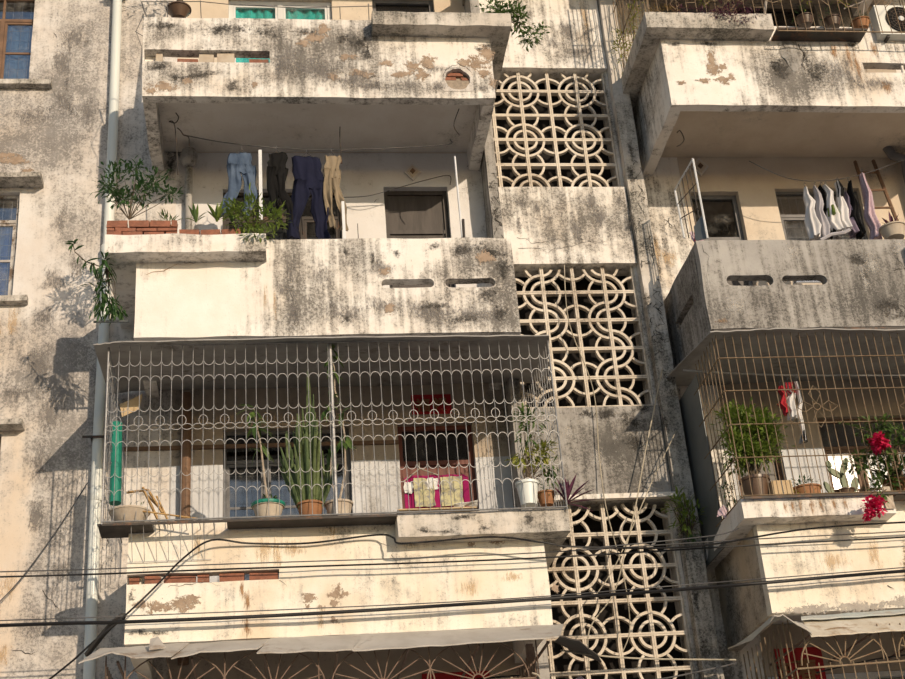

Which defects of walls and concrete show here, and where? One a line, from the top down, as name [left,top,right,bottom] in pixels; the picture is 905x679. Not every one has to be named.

peeling [296,22,331,47]
damp [52,30,89,82]
flaking render [328,44,497,92]
peeling [676,48,735,85]
damp [770,59,789,79]
damp [802,48,891,88]
damp [449,242,513,279]
damp [326,305,360,322]
damp [369,288,508,323]
damp [28,507,43,531]
peeling [132,594,201,614]
peeling [301,582,349,624]